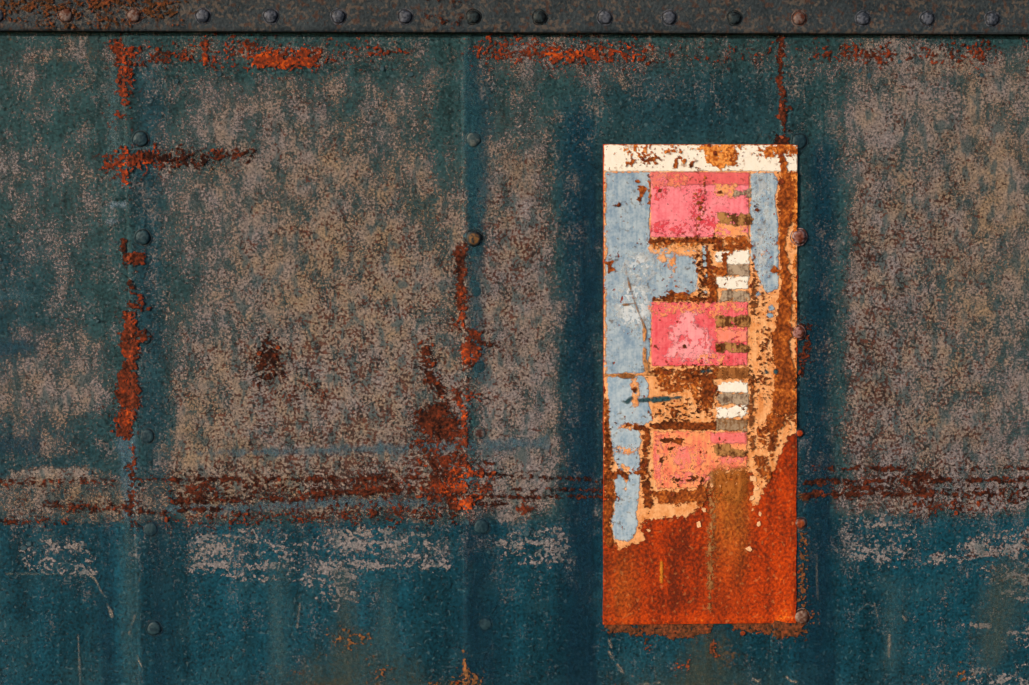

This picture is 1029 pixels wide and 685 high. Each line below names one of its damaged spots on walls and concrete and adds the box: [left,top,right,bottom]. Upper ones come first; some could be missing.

corrosion [0,0,412,123]
corrosion [468,33,787,70]
corrosion [98,143,257,189]
peeling [0,34,736,612]
corrosion [0,238,722,548]
corrosion [795,462,1029,518]
corrosion [731,529,815,640]
corrosion [604,624,720,658]